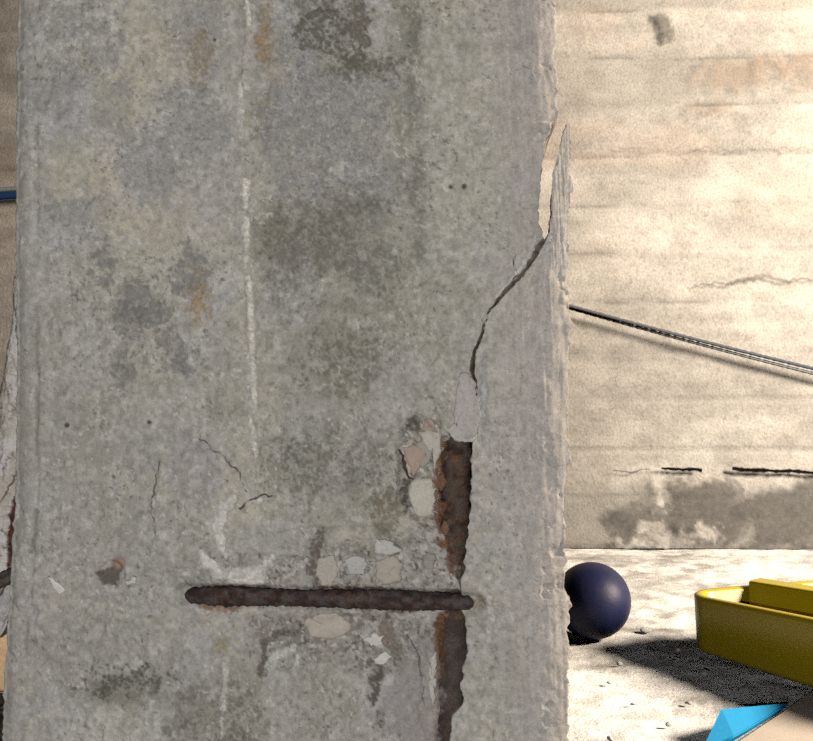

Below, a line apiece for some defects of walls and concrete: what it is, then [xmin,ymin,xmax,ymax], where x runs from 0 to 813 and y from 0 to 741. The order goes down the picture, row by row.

crack [470,235,546,424]
spalling [167,372,482,741]
corrosion [432,438,462,574]
crack [613,466,702,474]
leakage [610,473,813,550]
crack [732,466,813,474]
corrosion [434,612,459,708]